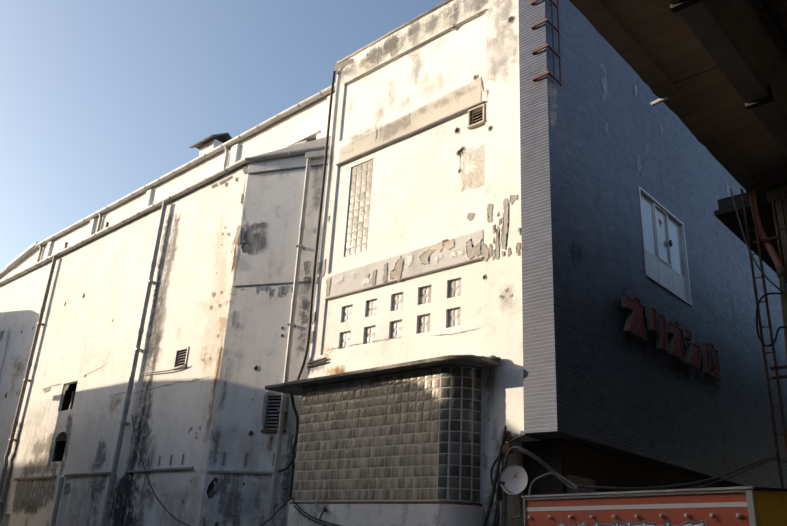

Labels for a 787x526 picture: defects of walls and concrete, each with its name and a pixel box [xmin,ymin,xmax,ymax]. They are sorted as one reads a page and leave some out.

leakage [366,36,402,67]
peeling [211,166,265,273]
peeling [363,194,521,288]
leakage [145,215,179,356]
peeling [255,285,293,297]
peeling [303,259,342,297]
crack [111,376,208,396]
leakage [88,415,153,526]
spalling [206,477,222,499]